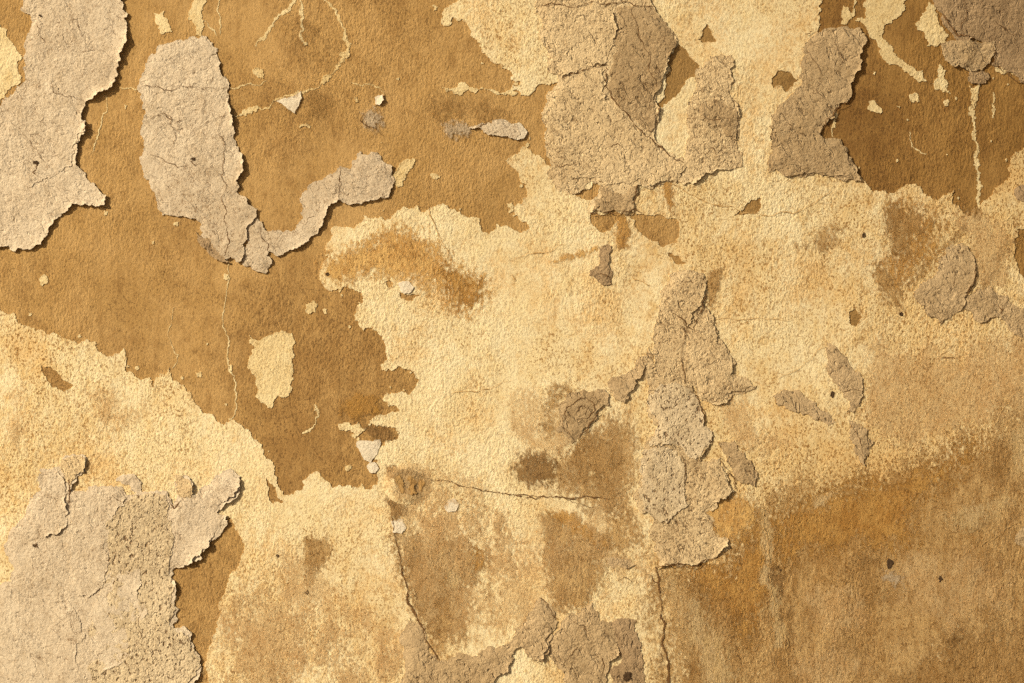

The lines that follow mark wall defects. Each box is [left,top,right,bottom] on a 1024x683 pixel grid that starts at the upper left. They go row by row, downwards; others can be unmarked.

peeling [768,0,1024,222]
peeling [0,0,761,569]
flaking render [913,243,1024,337]
peeling [1014,229,1024,277]
flaking render [773,389,835,425]
flaking render [825,342,873,475]
flaking render [0,454,245,683]
crack [391,515,440,663]
crack [424,477,612,508]
flaking render [399,597,645,683]
leakage [642,391,1024,683]